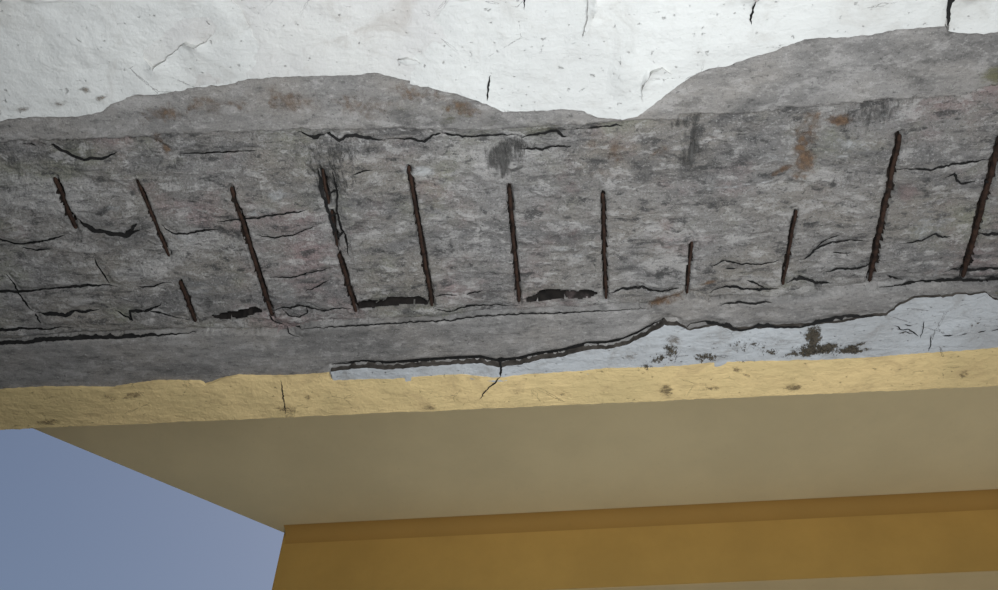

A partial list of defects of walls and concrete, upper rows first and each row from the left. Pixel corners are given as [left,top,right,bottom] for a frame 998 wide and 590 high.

crack [23,141,117,161]
crack [180,148,255,156]
corrosion [406,164,435,306]
crack [294,124,622,151]
spalling [0,0,998,340]
crack [0,168,998,399]
corrosion [507,183,521,302]
leakage [641,340,678,370]
peeling [331,291,998,382]
leakage [730,319,871,363]
corrosion [866,131,902,282]
corrosion [959,136,998,278]